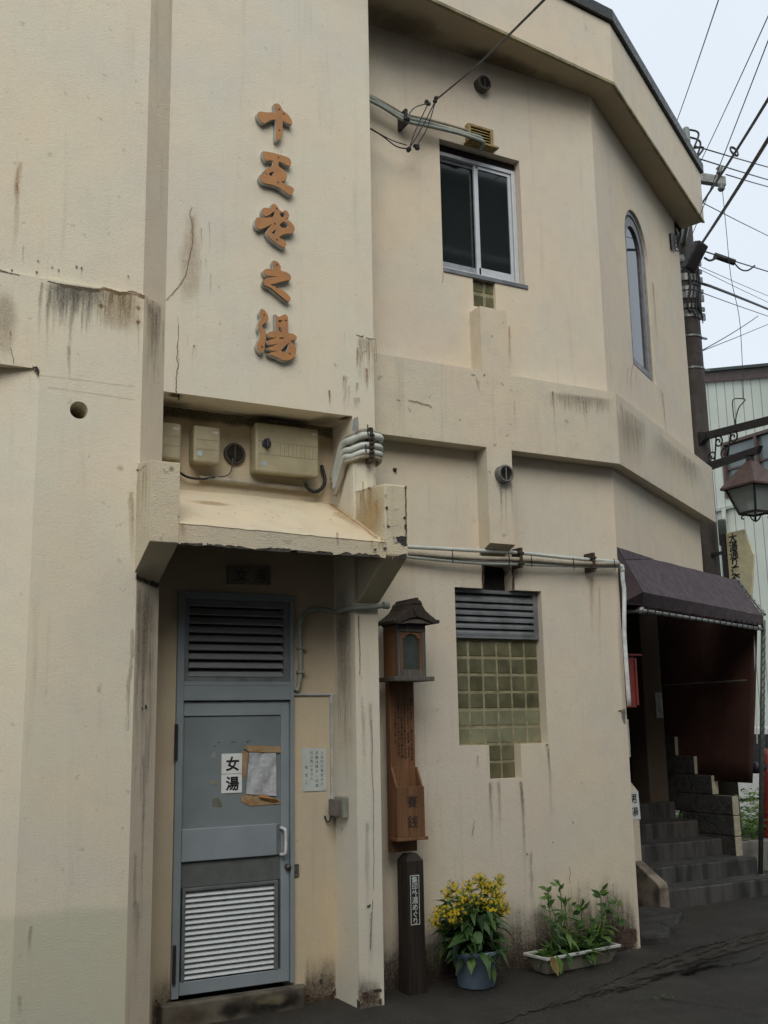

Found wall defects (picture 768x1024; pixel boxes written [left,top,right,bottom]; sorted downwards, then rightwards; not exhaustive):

crack [47,208,193,301]
crack [174,324,182,393]
peeling [180,506,408,559]
leakage [384,953,399,991]
leakage [487,909,635,972]